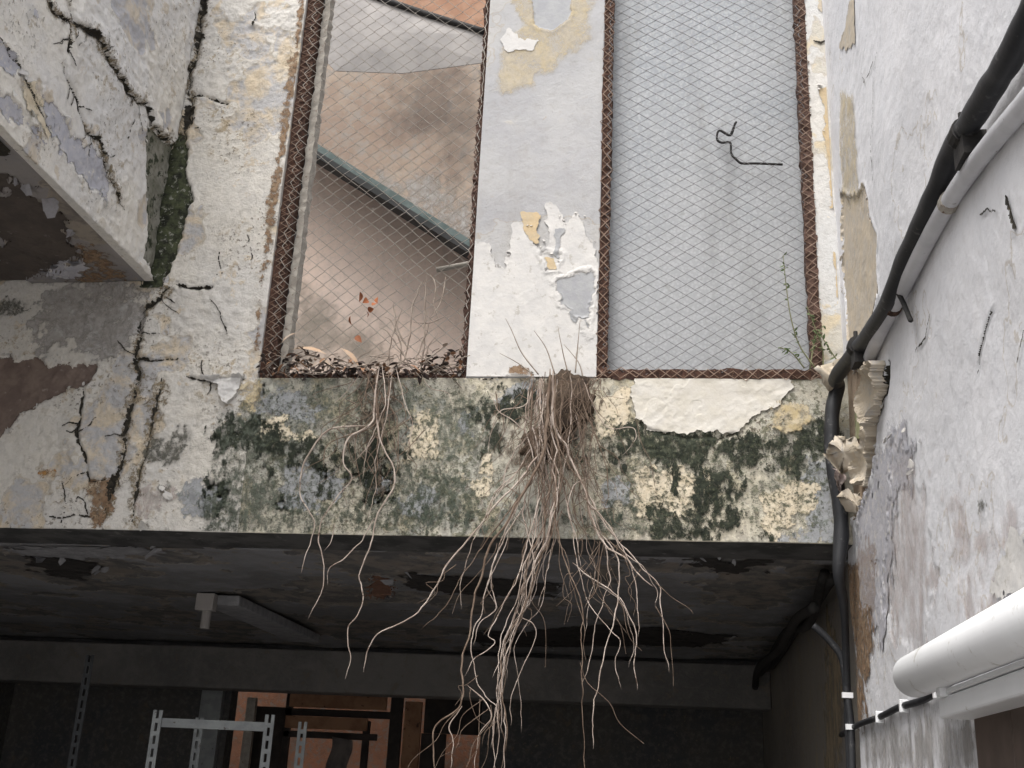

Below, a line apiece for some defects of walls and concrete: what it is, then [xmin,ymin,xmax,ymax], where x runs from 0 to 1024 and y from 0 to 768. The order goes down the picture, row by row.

flaking render [0,353,98,438]
peeling [0,39,116,209]
crack [47,0,229,210]
crack [49,252,228,528]
peeling [199,372,243,404]
rust [254,0,304,351]
peeling [458,202,599,404]
flaking render [500,0,572,52]
peeling [590,378,794,441]
peeling [817,83,878,341]